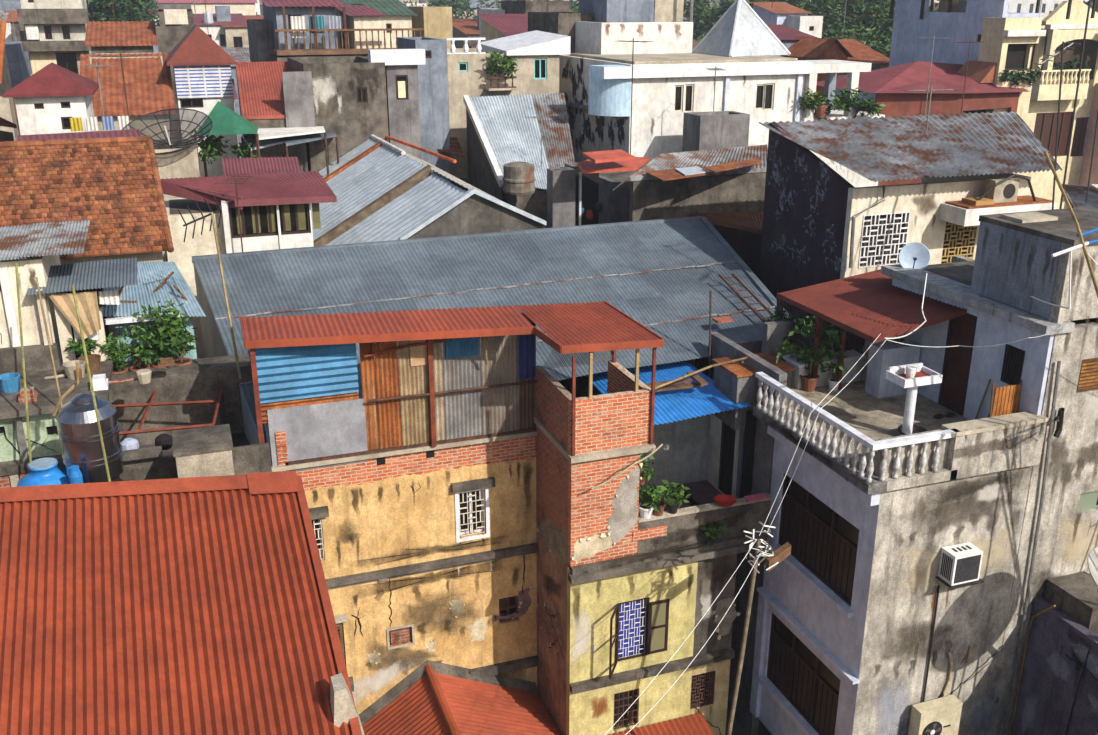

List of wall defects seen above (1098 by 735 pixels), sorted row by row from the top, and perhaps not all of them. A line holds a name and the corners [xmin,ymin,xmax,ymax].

leakage [1072,258,1095,279]
leakage [942,428,1018,456]
leakage [509,464,532,496]
leakage [352,489,363,509]
leakage [909,473,1020,589]
leakage [392,536,485,560]
crack [351,579,392,637]
leakage [377,562,492,632]
leakage [895,626,950,671]